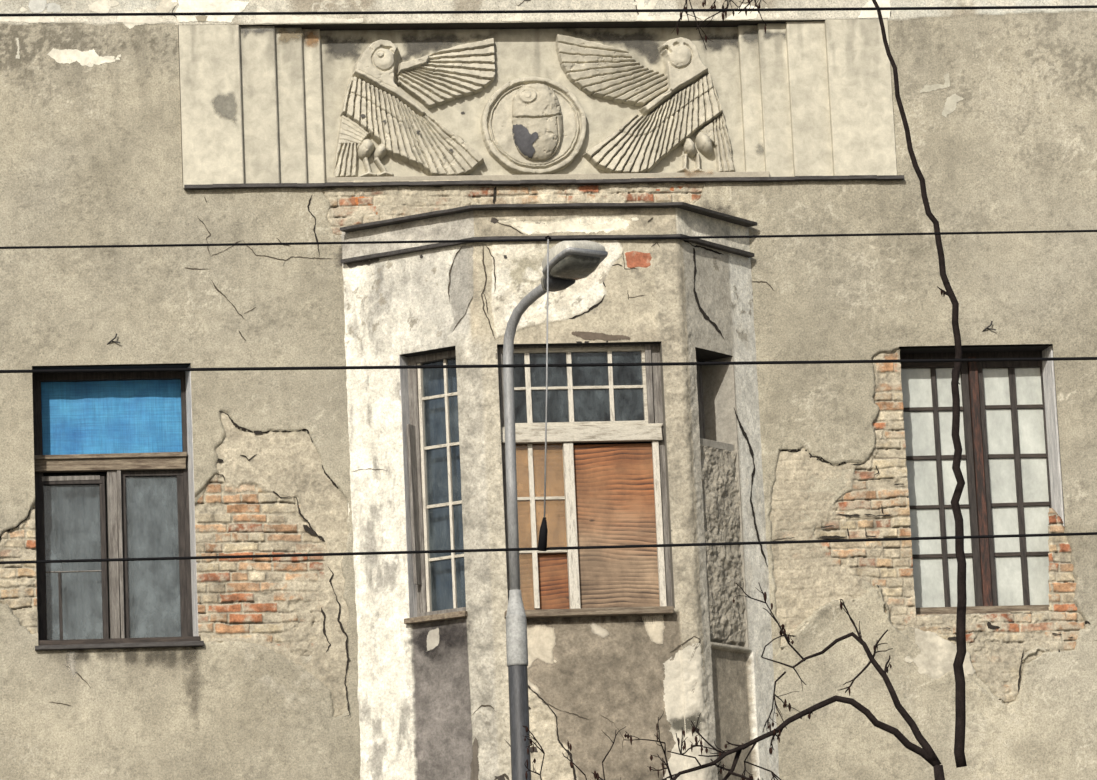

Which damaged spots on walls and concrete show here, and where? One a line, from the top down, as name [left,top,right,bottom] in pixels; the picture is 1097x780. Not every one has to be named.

peeling [0,0,62,24]
peeling [47,48,121,67]
peeling [88,0,363,29]
crack [185,196,338,341]
crack [448,222,545,340]
spalling [307,177,705,257]
spalling [0,503,38,634]
spalling [195,411,350,717]
crack [734,408,794,567]
spalling [770,348,1090,705]
peeling [527,625,557,696]
peeling [663,643,712,780]